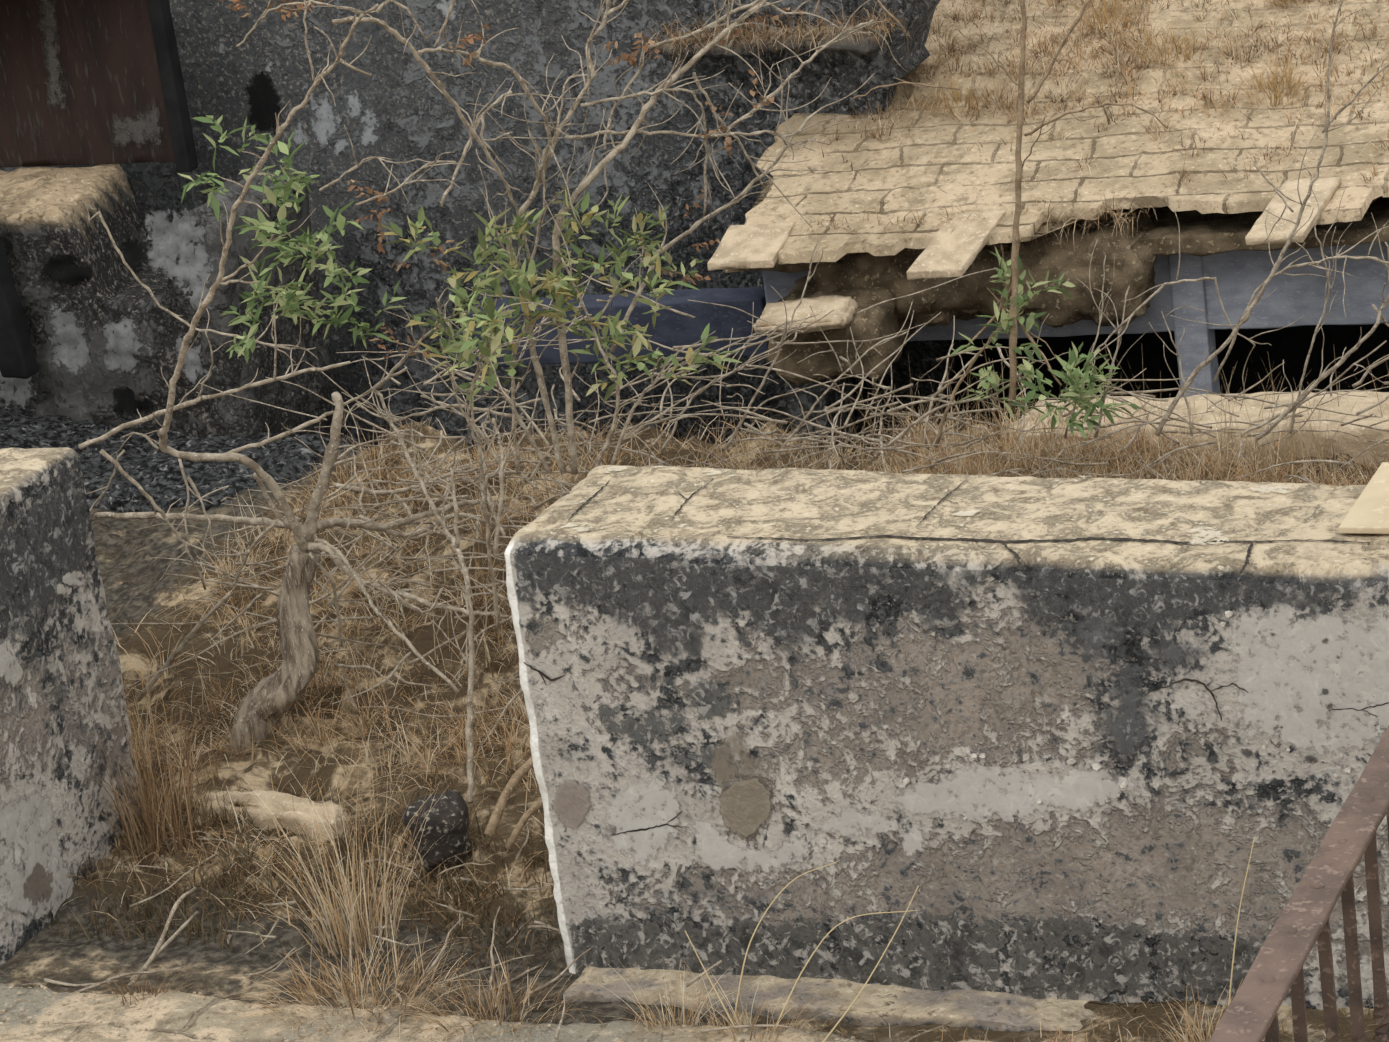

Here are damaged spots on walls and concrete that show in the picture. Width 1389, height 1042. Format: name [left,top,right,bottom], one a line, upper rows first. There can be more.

crack [727,479,1370,573]
leakage [514,555,1359,672]
leakage [597,677,732,768]
crack [1145,678,1248,721]
flaking render [552,753,1135,873]
leakage [570,912,1262,1002]